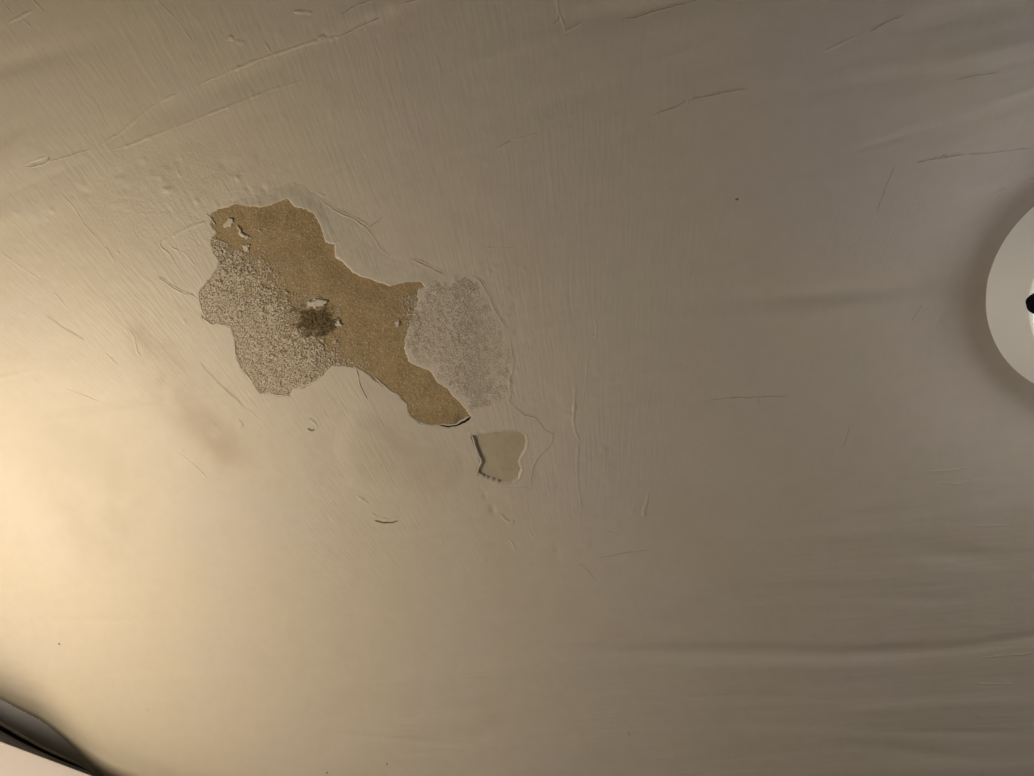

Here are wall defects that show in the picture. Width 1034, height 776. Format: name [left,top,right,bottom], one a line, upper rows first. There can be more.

peeling [157,182,529,485]